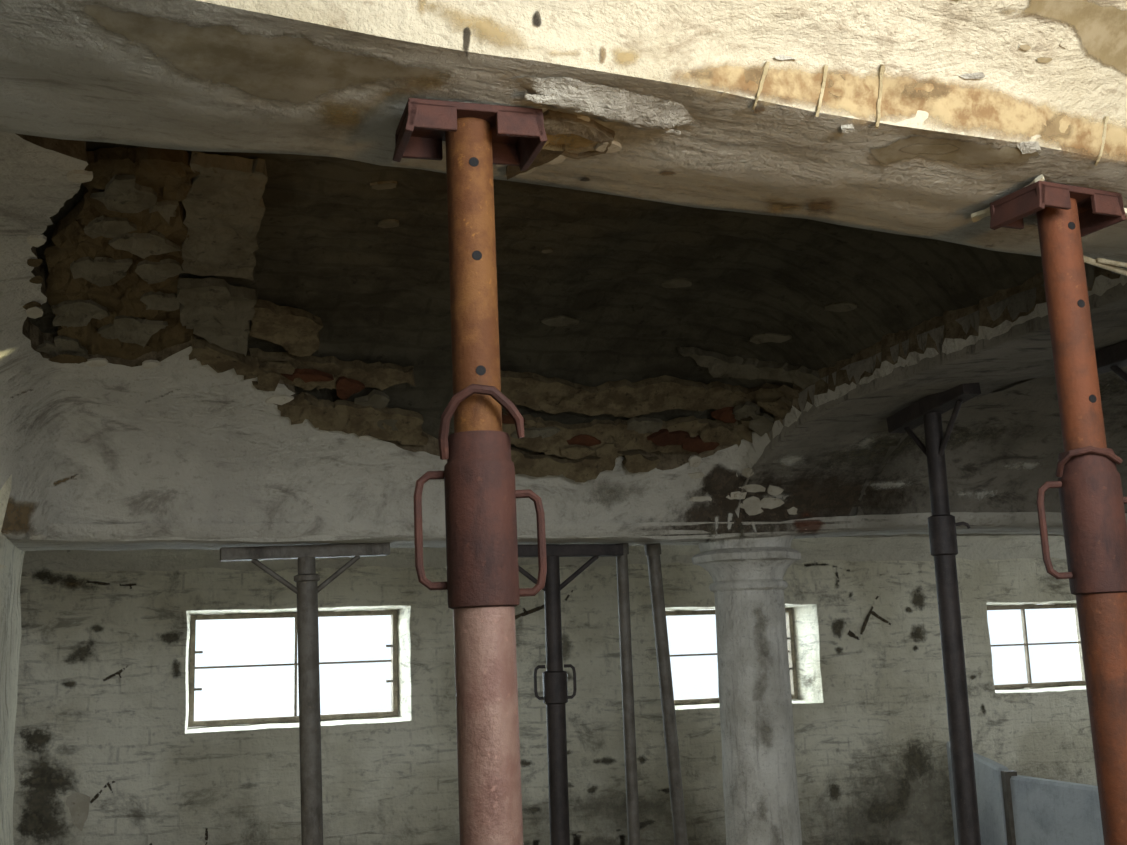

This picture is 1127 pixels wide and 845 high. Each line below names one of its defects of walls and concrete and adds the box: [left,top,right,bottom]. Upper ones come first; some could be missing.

peeling [1002,0,1127,76]
flaking render [675,55,1127,166]
flaking render [17,134,454,461]
flaking render [493,109,1046,535]
flaking render [1084,263,1121,291]
damp [18,729,74,842]
damp [830,784,840,800]
damp [844,744,954,845]